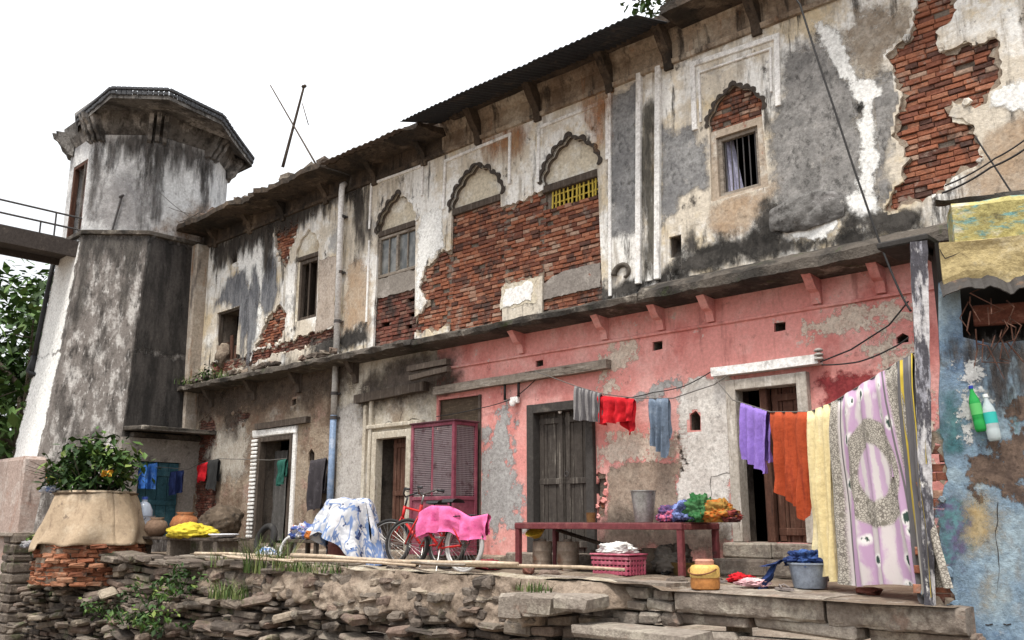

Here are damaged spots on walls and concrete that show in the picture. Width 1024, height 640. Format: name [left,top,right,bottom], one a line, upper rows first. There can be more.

leakage [597,5,920,300]
flaking render [886,0,1002,212]
leakage [14,135,461,499]
flaking render [211,304,341,375]
flaking render [273,220,299,267]
flaking render [416,247,453,333]
flaking render [500,192,545,311]
peeling [596,332,642,396]
peeling [801,297,915,406]
peeling [481,387,527,547]
peeling [913,357,1024,605]